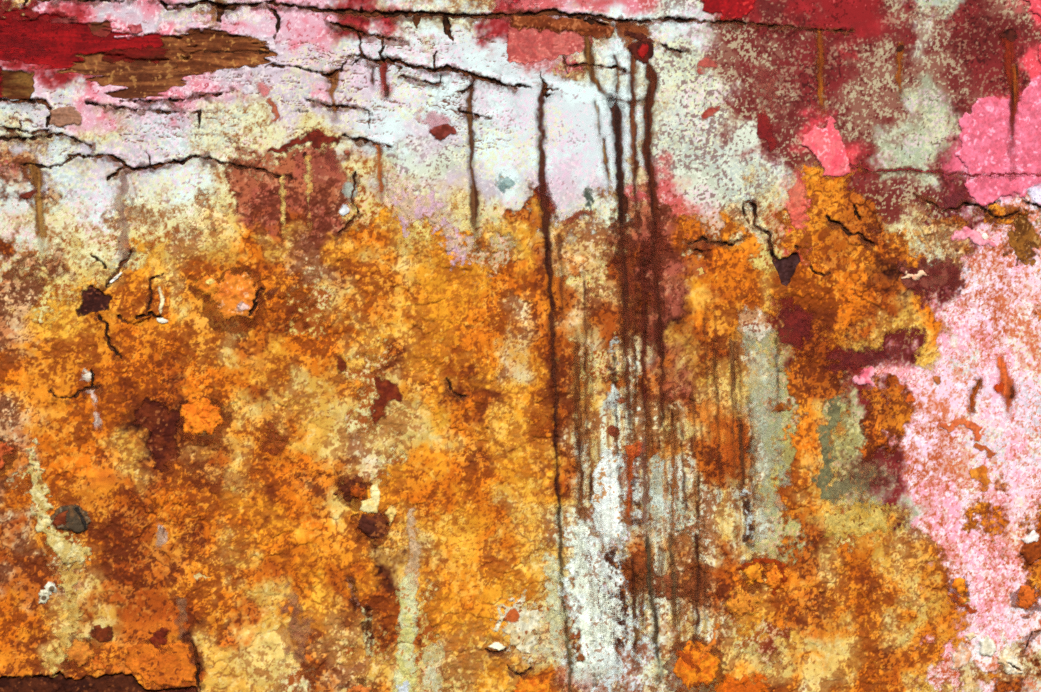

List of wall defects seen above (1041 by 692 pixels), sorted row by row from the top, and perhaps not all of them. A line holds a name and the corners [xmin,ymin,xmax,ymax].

rust [0,132,62,237]
peeling [0,7,278,100]
crack [0,97,294,180]
crack [85,87,233,128]
crack [160,0,854,148]
crack [687,200,831,277]
peeling [787,183,810,229]
peeling [801,116,850,177]
rust [856,373,916,464]
rust [938,356,1041,625]
spalling [0,671,198,692]
rust [954,641,1029,692]